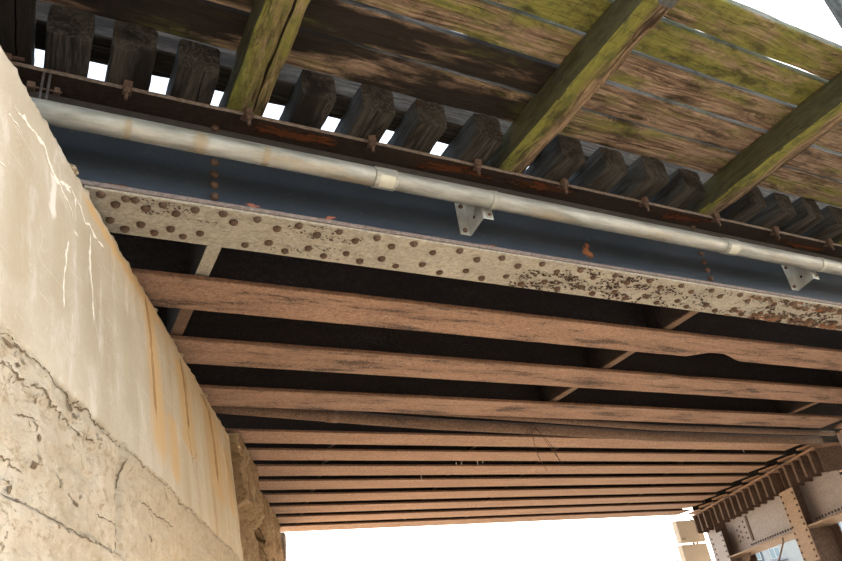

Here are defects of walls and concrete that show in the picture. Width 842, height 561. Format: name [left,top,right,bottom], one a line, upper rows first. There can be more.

water stain [0,162,35,292]
water stain [46,195,102,374]
corrosion [81,190,237,522]
corrosion [508,267,842,331]
crack [0,333,242,561]